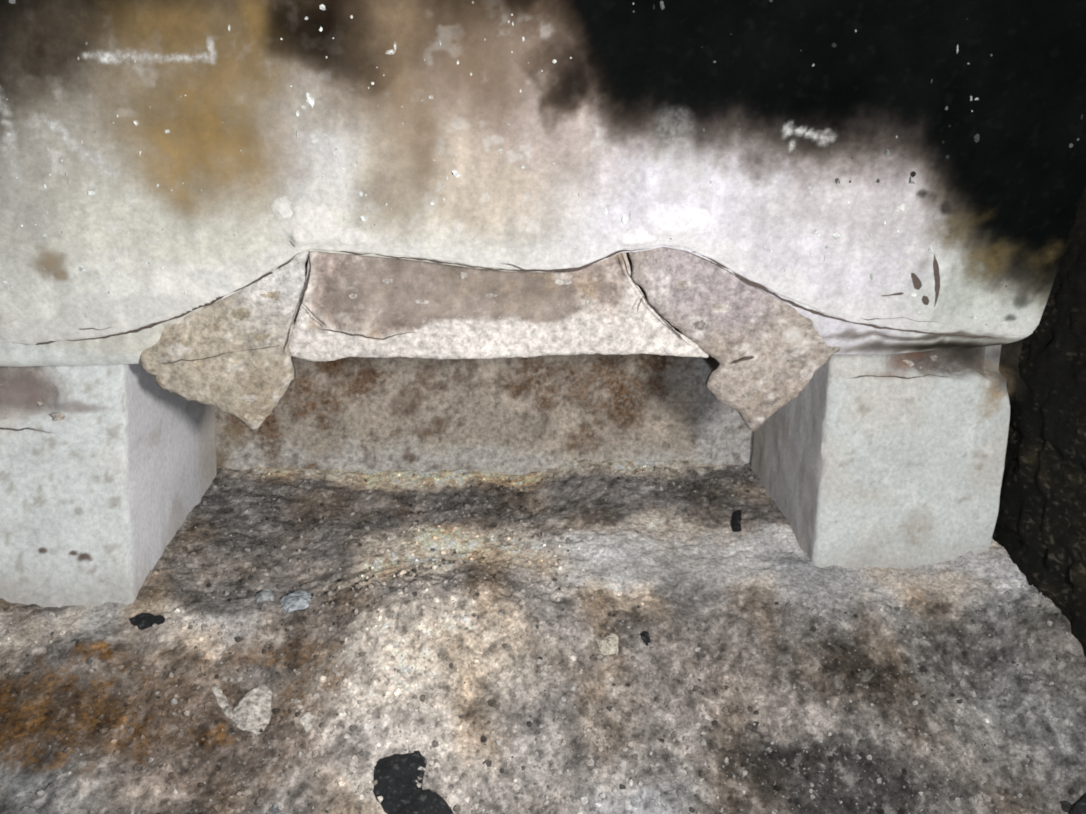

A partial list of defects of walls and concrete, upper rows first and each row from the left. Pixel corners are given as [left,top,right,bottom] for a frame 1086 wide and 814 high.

spalling [342,258,571,327]
flaking render [139,251,309,430]
flaking render [628,247,841,432]
crack [0,427,56,435]
corrosion [257,416,279,459]
corrosion [288,380,339,426]
corrosion [508,357,554,408]
corrosion [569,354,679,426]